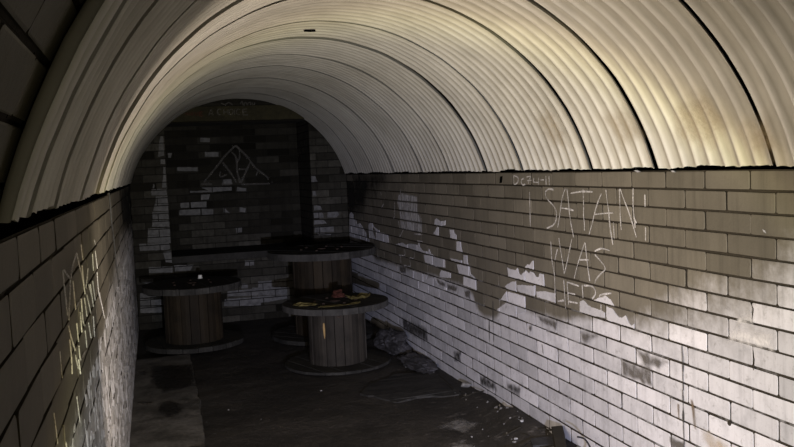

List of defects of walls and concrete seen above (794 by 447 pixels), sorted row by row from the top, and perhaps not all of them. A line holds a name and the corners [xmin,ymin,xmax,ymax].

peeling [179,179,246,215]
peeling [311,176,339,235]
peeling [349,212,476,299]
peeling [85,136,192,447]
peeling [224,279,287,306]
peeling [497,261,556,315]
peeling [580,296,634,328]